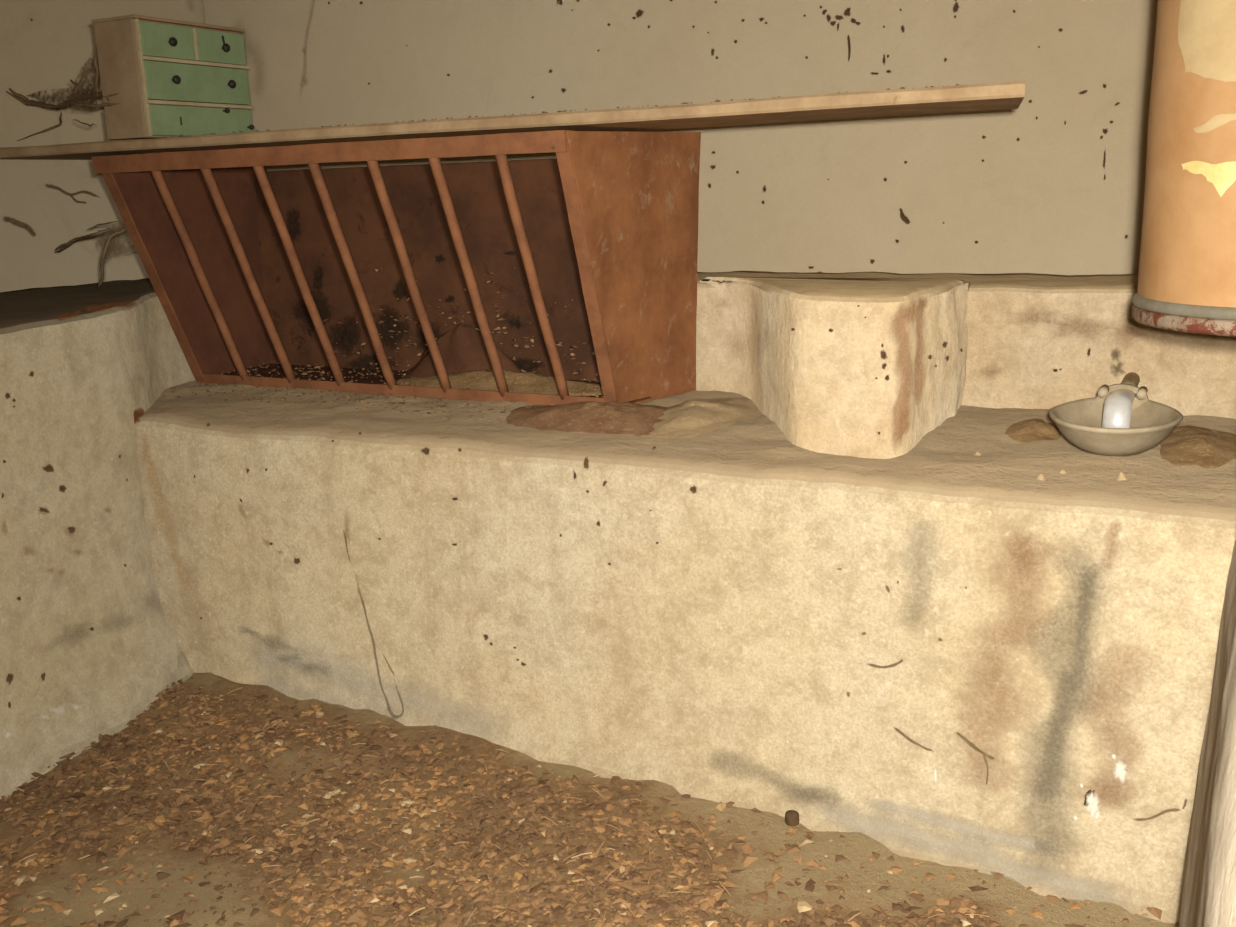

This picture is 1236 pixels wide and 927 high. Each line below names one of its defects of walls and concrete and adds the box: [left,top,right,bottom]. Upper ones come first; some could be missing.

corrosion [895,300,924,439]
crack [359,592,403,718]
damp [828,631,1108,901]
damp [1112,755,1126,782]